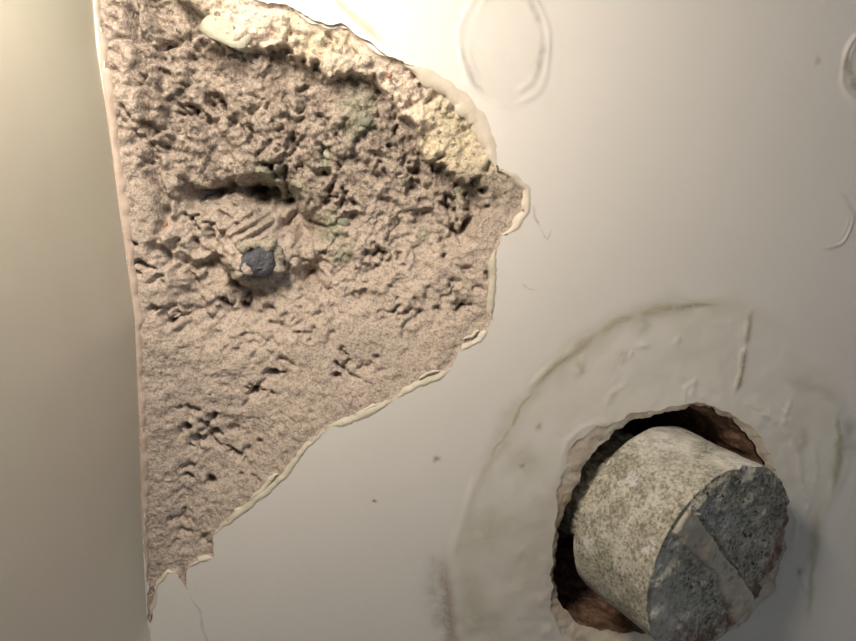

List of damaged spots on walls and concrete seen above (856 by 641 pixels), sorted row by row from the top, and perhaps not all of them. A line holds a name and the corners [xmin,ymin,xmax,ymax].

spalling [95,0,531,624]